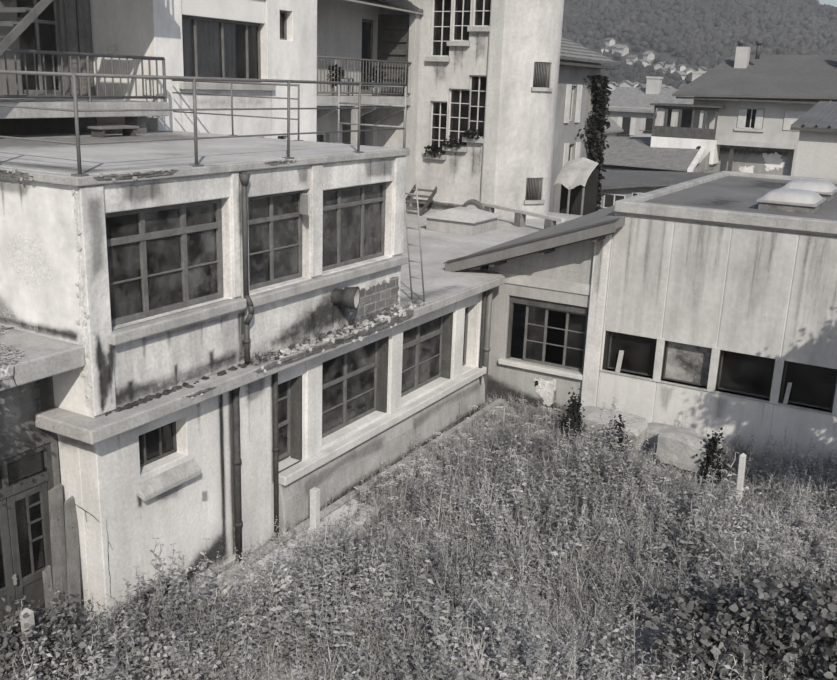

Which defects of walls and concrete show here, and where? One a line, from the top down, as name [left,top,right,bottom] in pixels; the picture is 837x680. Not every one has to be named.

flaking render [762,152,785,171]
damp [205,312,244,370]
damp [97,339,177,409]